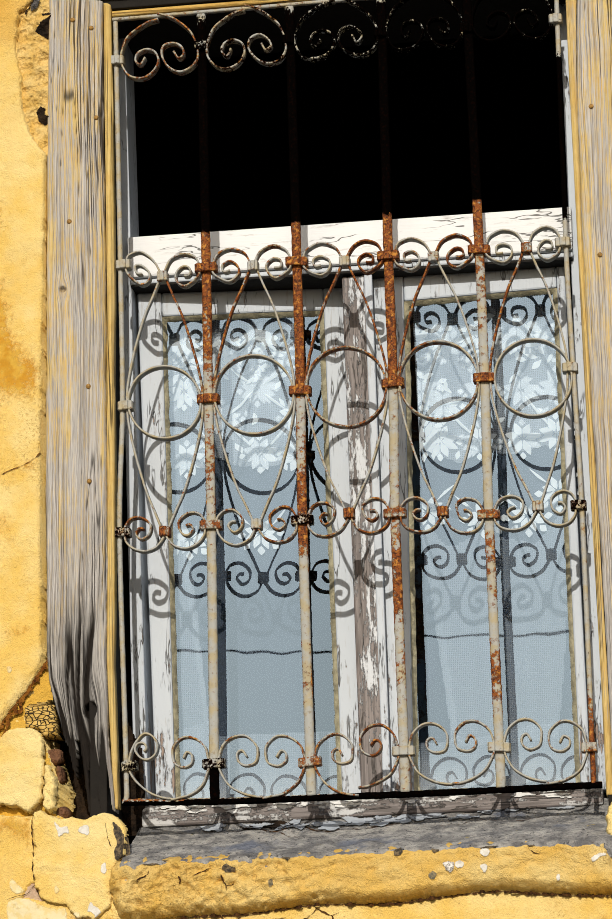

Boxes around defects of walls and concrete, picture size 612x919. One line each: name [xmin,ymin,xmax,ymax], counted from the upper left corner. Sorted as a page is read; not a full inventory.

flaking render [16,0,51,156]
flaking render [0,663,53,737]
spalling [0,735,90,836]
spalling [120,711,145,836]
peeling [160,804,257,814]
peeling [201,823,226,832]
peeling [238,799,530,831]
peeling [496,790,574,809]
peeling [7,879,101,919]